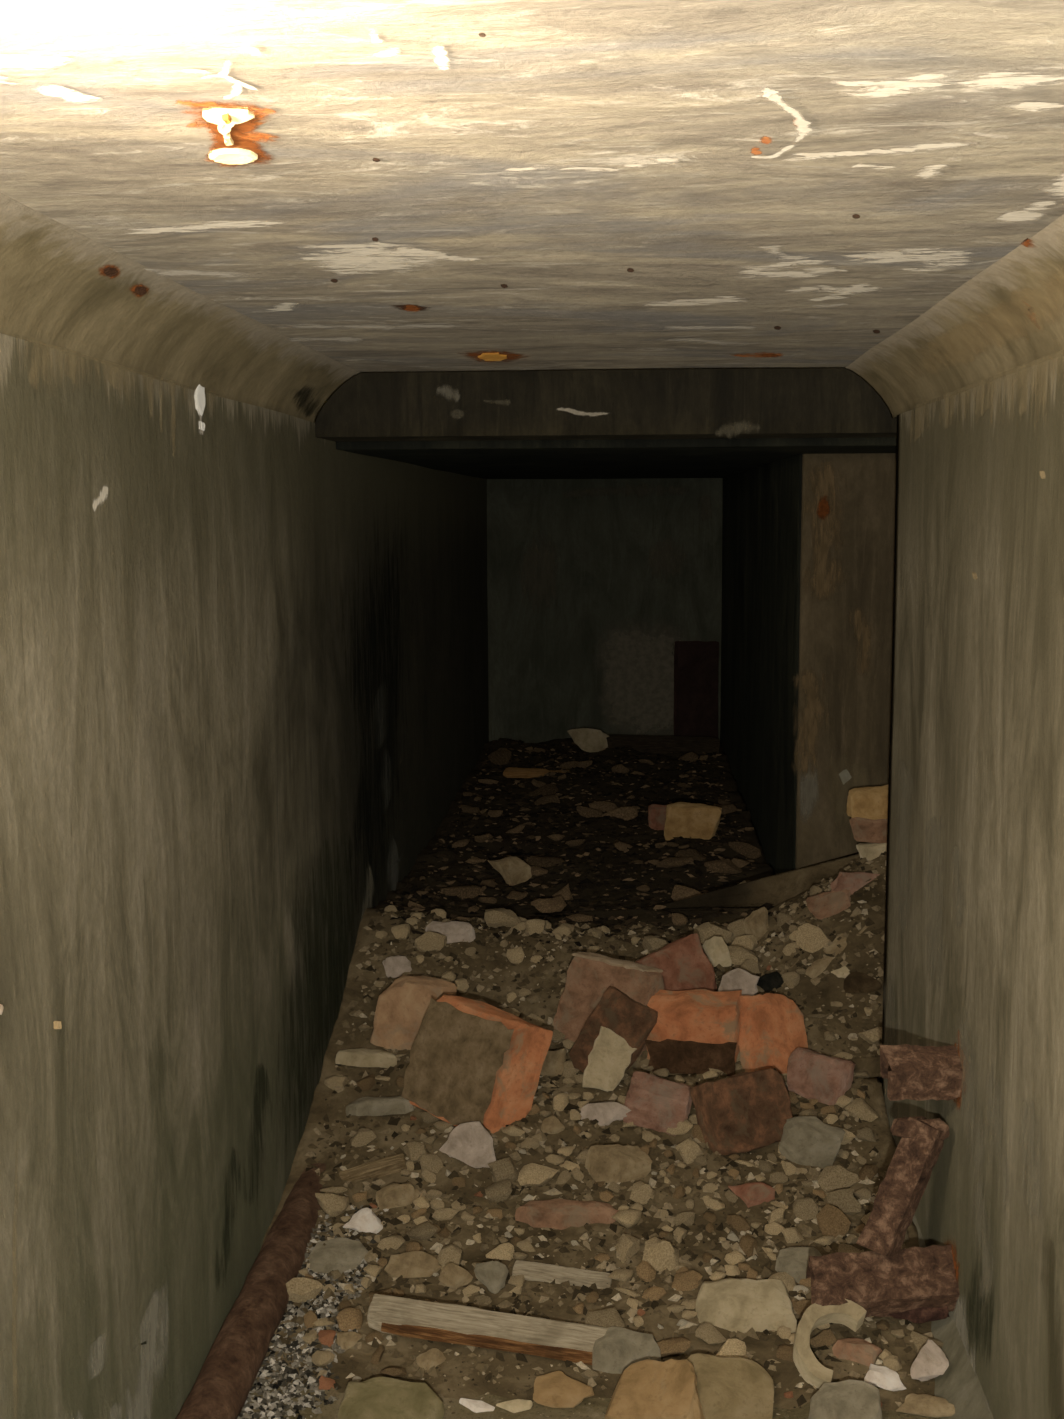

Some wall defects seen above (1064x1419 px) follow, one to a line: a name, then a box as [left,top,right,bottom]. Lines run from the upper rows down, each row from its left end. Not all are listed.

rust [176,100,276,166]
rust [461,351,528,362]